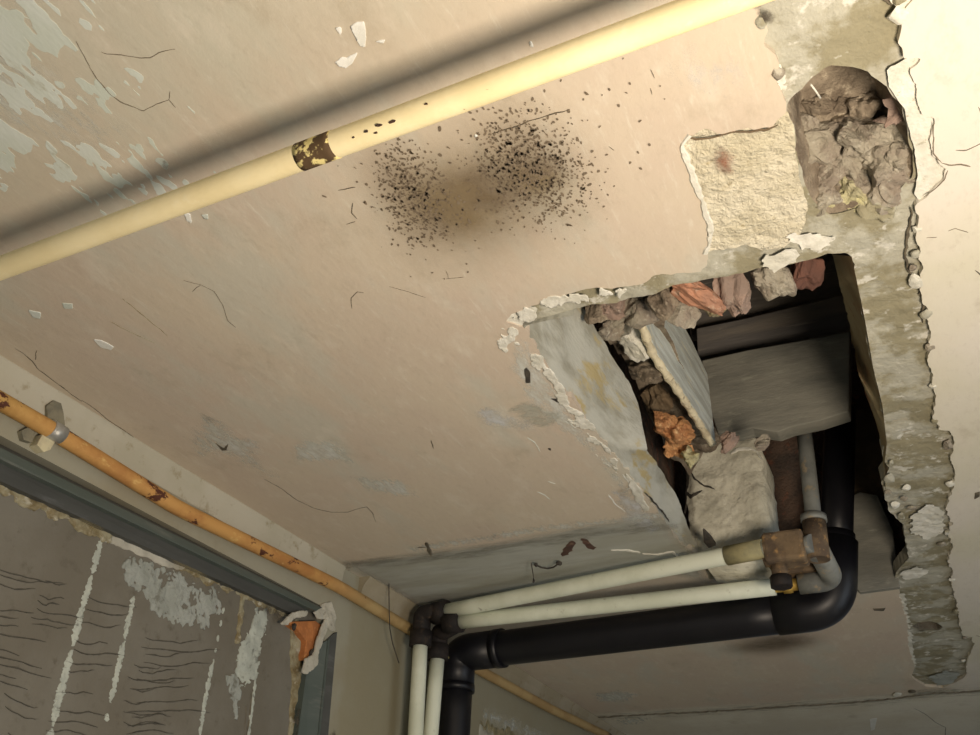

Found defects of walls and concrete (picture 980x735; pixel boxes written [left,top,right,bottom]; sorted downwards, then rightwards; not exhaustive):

peeling [0,0,116,126]
crack [76,42,176,111]
peeling [0,119,189,216]
water stain [354,89,615,255]
spalling [497,0,973,686]